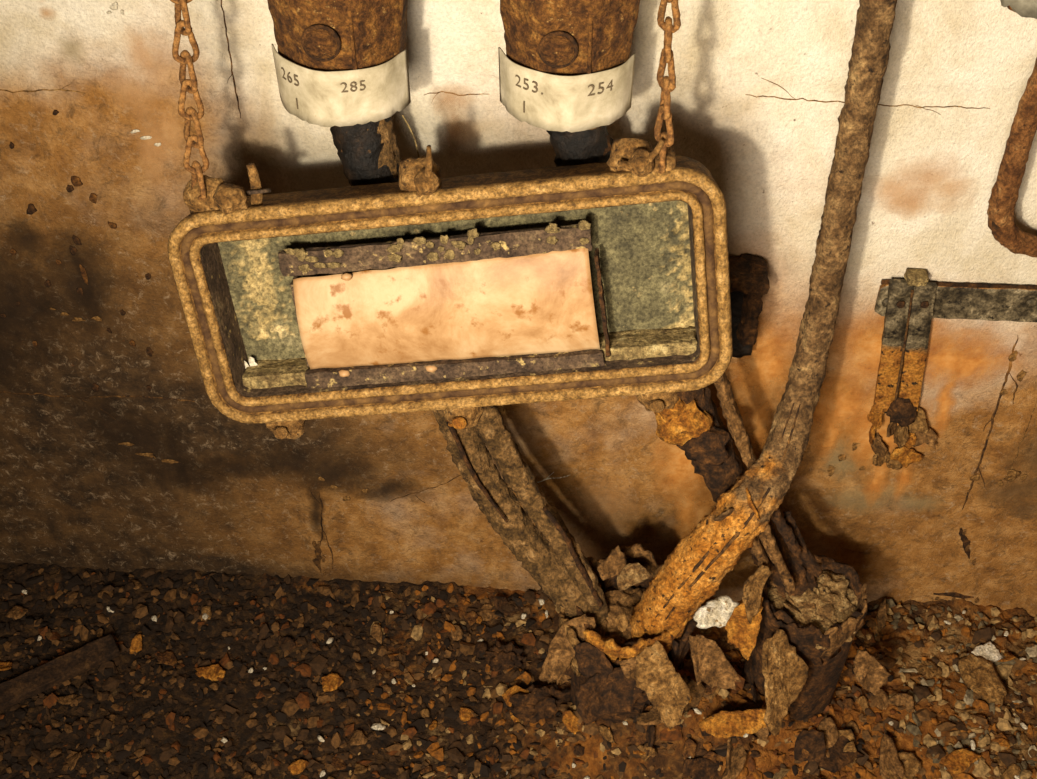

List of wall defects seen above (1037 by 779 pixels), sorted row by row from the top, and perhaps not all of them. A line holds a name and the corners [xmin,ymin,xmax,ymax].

leakage [56,243,104,312]
leakage [83,397,253,485]
leakage [276,454,403,499]
rust [813,325,899,493]
rust [925,343,1004,430]
crack [962,335,1037,510]
crack [309,488,334,572]